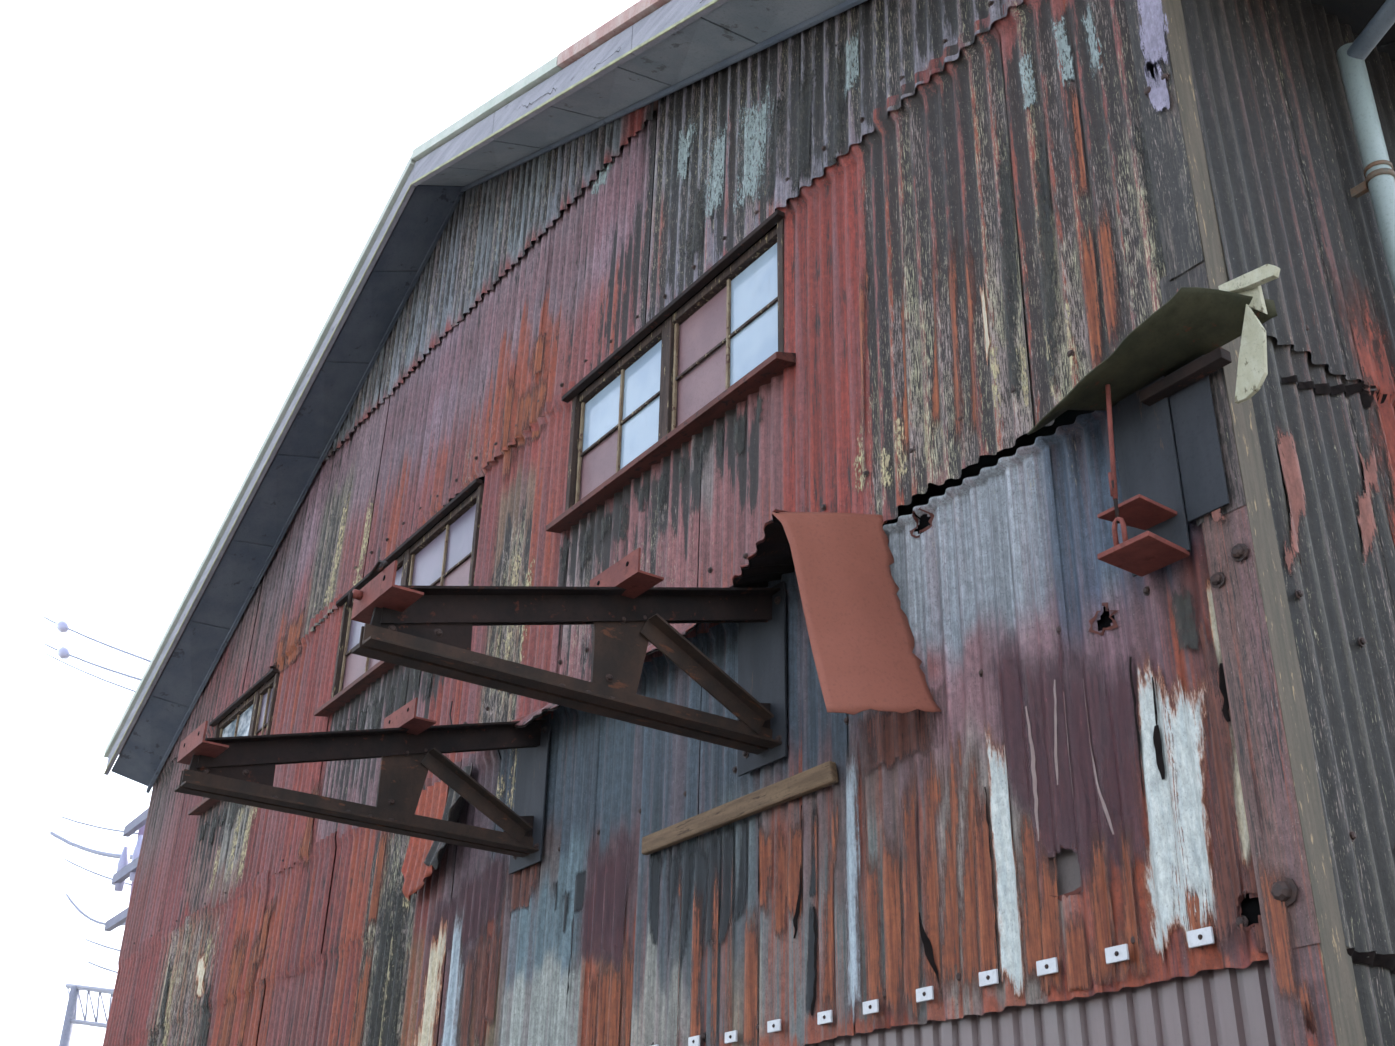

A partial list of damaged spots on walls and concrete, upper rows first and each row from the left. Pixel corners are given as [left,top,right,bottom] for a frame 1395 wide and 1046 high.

water stain [766,44,846,206]
peeling [1137,0,1170,112]
rust [931,242,978,443]
water stain [147,951,173,1046]
water stain [198,978,213,1046]
water stain [366,848,411,1046]
rust [429,854,541,1046]
rust [677,802,838,1046]
rust [858,681,998,1029]
peeling [985,728,1025,999]
rust [992,629,1147,999]
peeling [1137,657,1216,964]